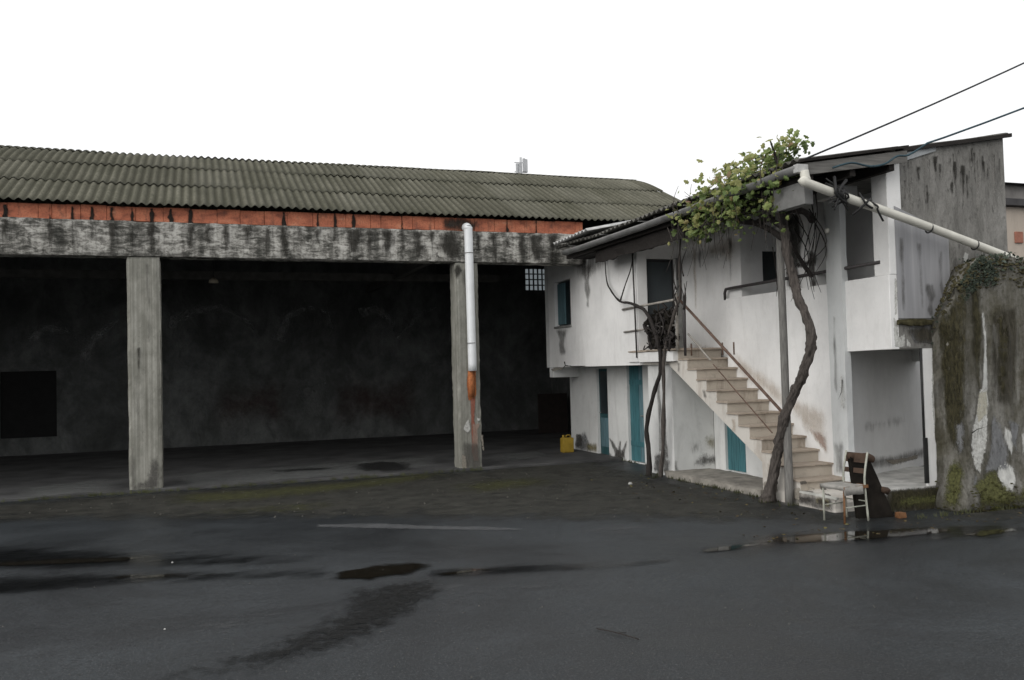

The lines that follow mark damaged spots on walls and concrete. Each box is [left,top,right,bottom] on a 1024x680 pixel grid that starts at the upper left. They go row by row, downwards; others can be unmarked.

leakage [933,149,1000,195]
leakage [98,207,130,254]
leakage [143,208,177,255]
leakage [188,209,210,247]
leakage [264,212,288,256]
leakage [316,213,557,282]
leakage [939,280,1017,426]
corrosion [467,371,479,461]